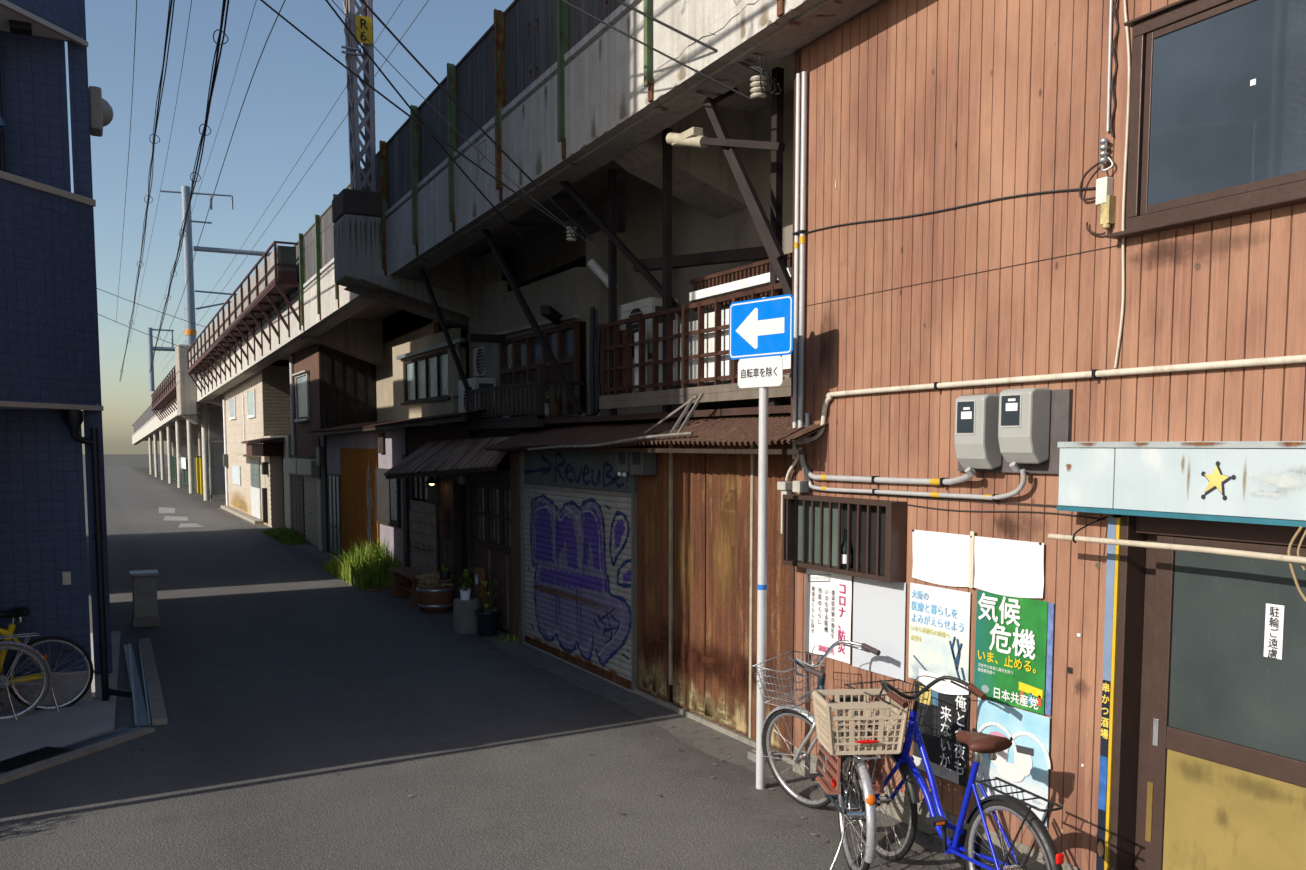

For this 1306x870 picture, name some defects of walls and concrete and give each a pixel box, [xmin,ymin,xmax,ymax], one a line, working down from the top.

crack [657,0,756,69]
corrosion [679,540,690,587]
corrosion [644,583,772,692]